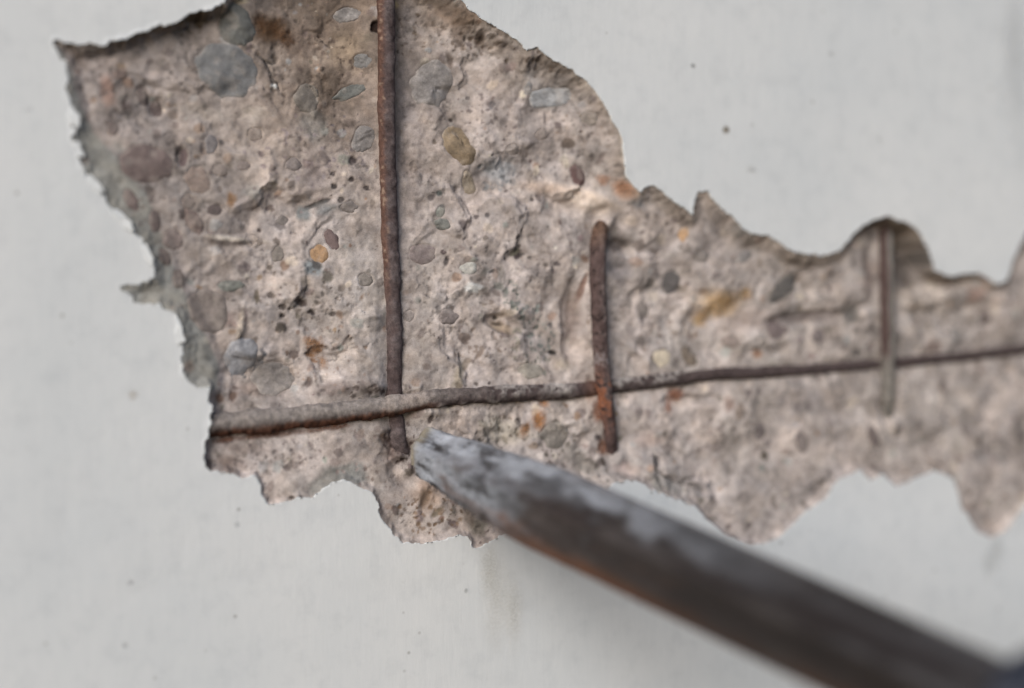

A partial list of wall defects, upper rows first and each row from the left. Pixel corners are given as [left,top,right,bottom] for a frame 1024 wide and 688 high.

corrosion [522,401,547,432]
spalling [54,0,1024,548]